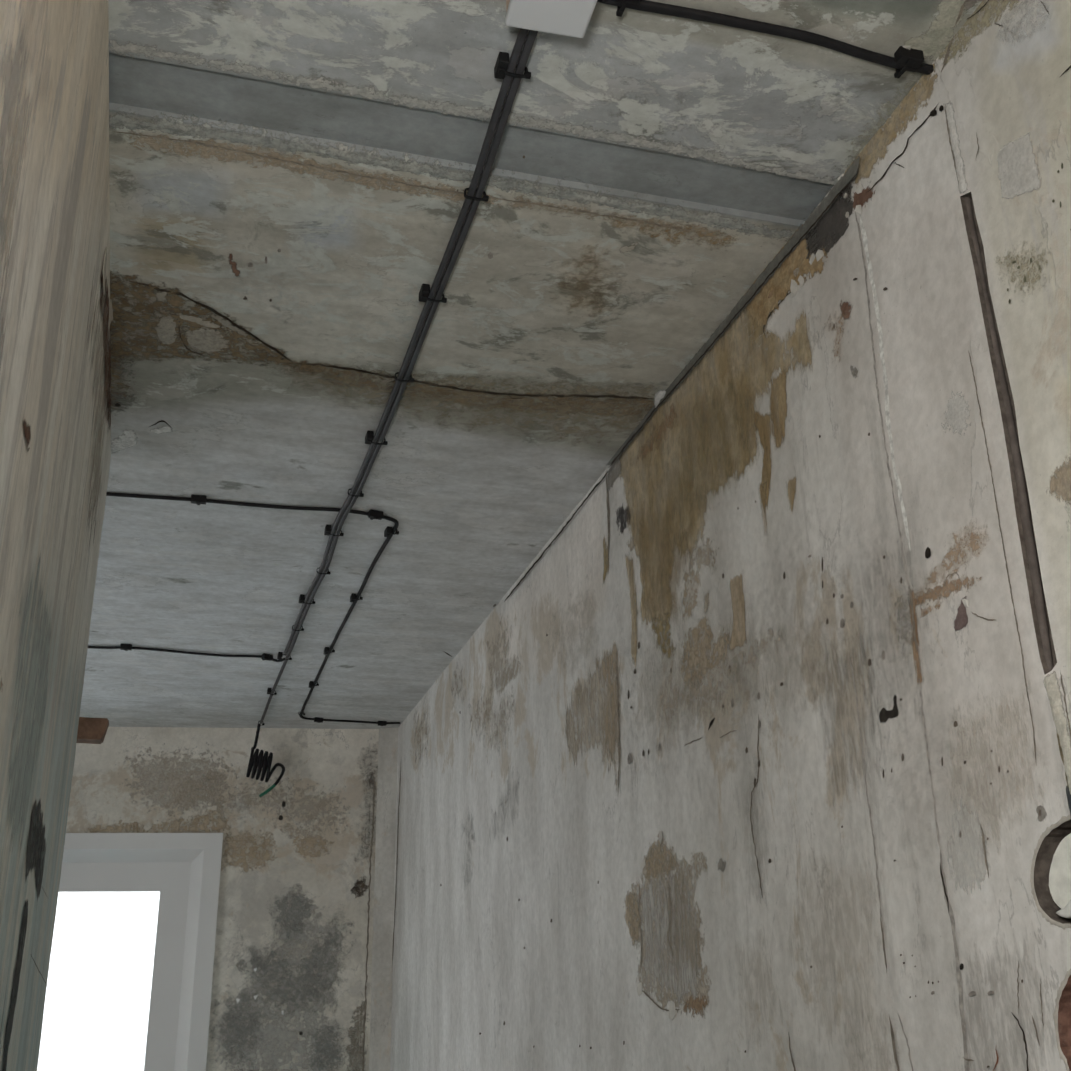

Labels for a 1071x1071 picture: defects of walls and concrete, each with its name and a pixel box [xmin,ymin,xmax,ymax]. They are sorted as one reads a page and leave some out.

spalling [109,0,1019,218]
spalling [109,113,828,335]
peeling [87,246,319,539]
crack [295,103,944,607]
peeling [1050,460,1071,501]
damp [211,885,353,1071]
peeling [625,831,709,1020]